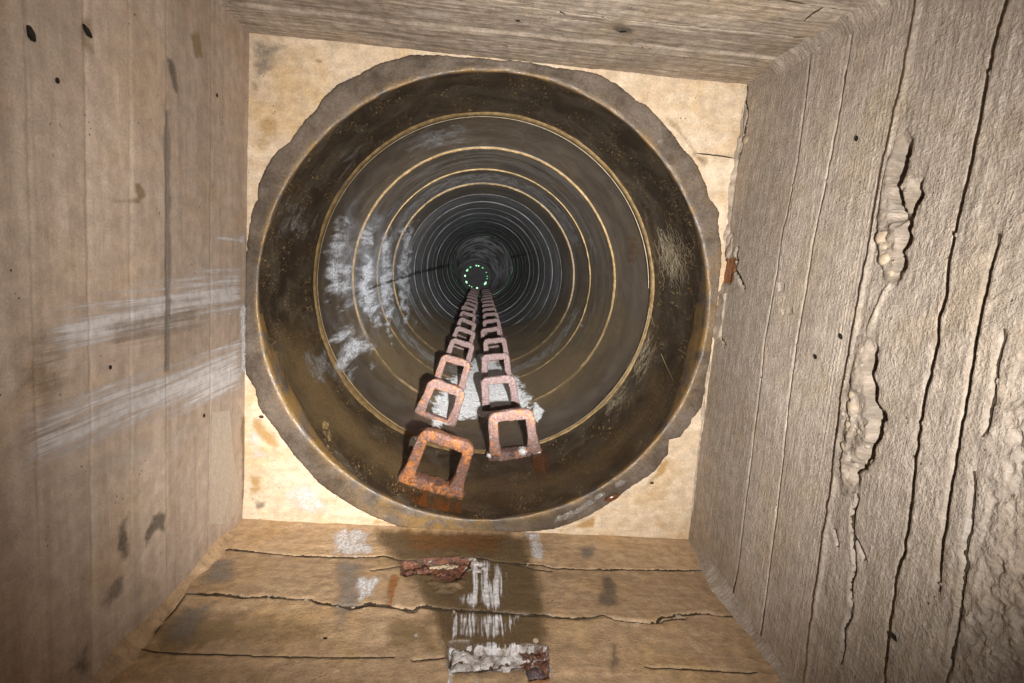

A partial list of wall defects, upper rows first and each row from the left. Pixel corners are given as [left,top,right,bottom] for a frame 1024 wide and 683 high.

leakage [30,113,246,461]
corrosion [724,258,736,284]
crack [983,329,1007,437]
leakage [145,514,164,540]
crack [142,554,741,662]
leakage [377,522,545,683]
crack [225,549,703,573]
crack [939,471,977,683]